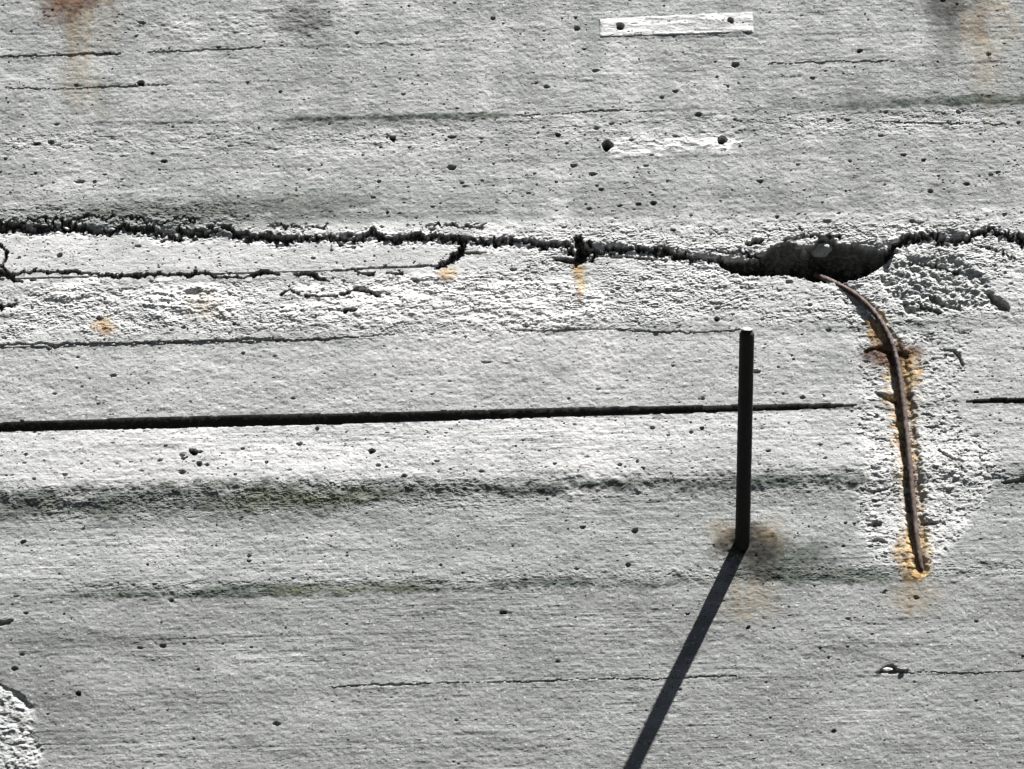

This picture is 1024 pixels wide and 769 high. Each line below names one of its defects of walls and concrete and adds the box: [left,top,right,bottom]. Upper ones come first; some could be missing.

crack [0,213,843,350]
crack [887,225,1024,277]
rust [864,318,927,576]
spalling [828,252,1024,580]
rust [718,524,775,573]
spalling [0,683,49,769]